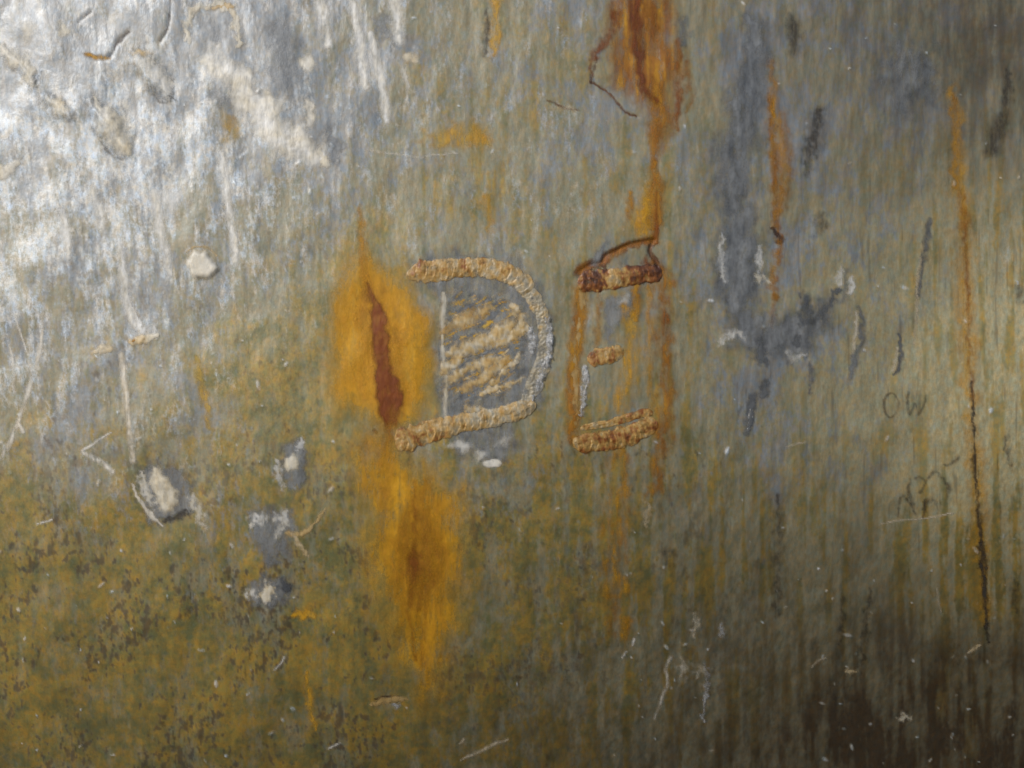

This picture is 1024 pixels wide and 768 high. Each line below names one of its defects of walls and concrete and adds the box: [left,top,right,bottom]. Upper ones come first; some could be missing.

rust [594,0,688,244]
rust [768,98,784,298]
rust [566,287,586,443]
rust [617,284,648,406]
rust [655,267,675,370]
peeling [132,466,205,526]
peeling [245,508,326,608]
peeling [274,439,306,489]
rust [330,221,464,689]
rust [971,381,990,643]